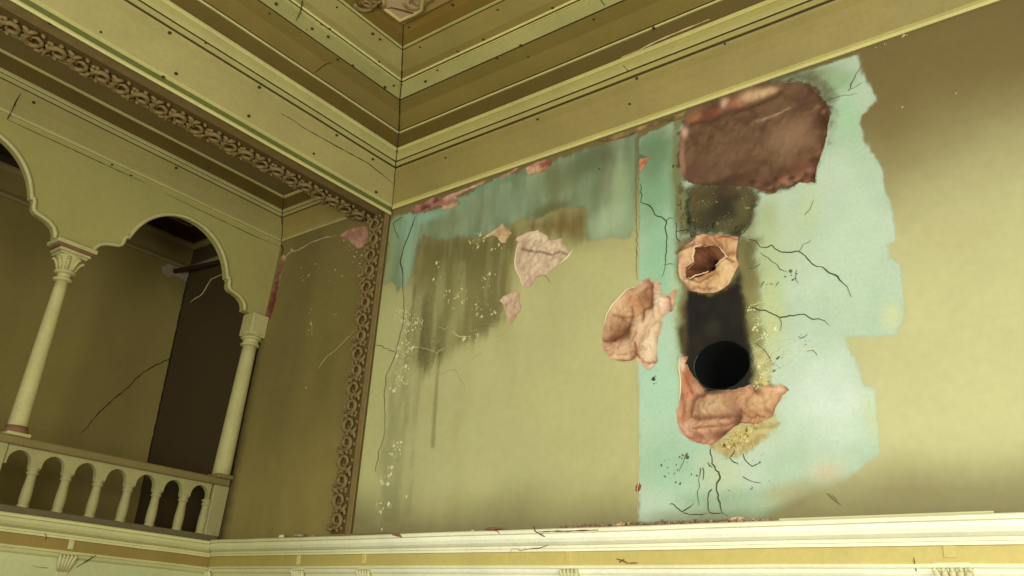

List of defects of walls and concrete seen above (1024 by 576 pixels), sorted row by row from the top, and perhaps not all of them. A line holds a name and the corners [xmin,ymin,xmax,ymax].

spalling [266,226,369,319]
flaking render [411,180,486,213]
spalling [432,223,572,326]
crack [635,137,688,276]
spalling [594,78,836,385]
crack [740,229,851,355]
crack [79,278,188,489]
water stain [374,201,602,530]
spalling [661,302,820,485]
crack [671,449,761,516]